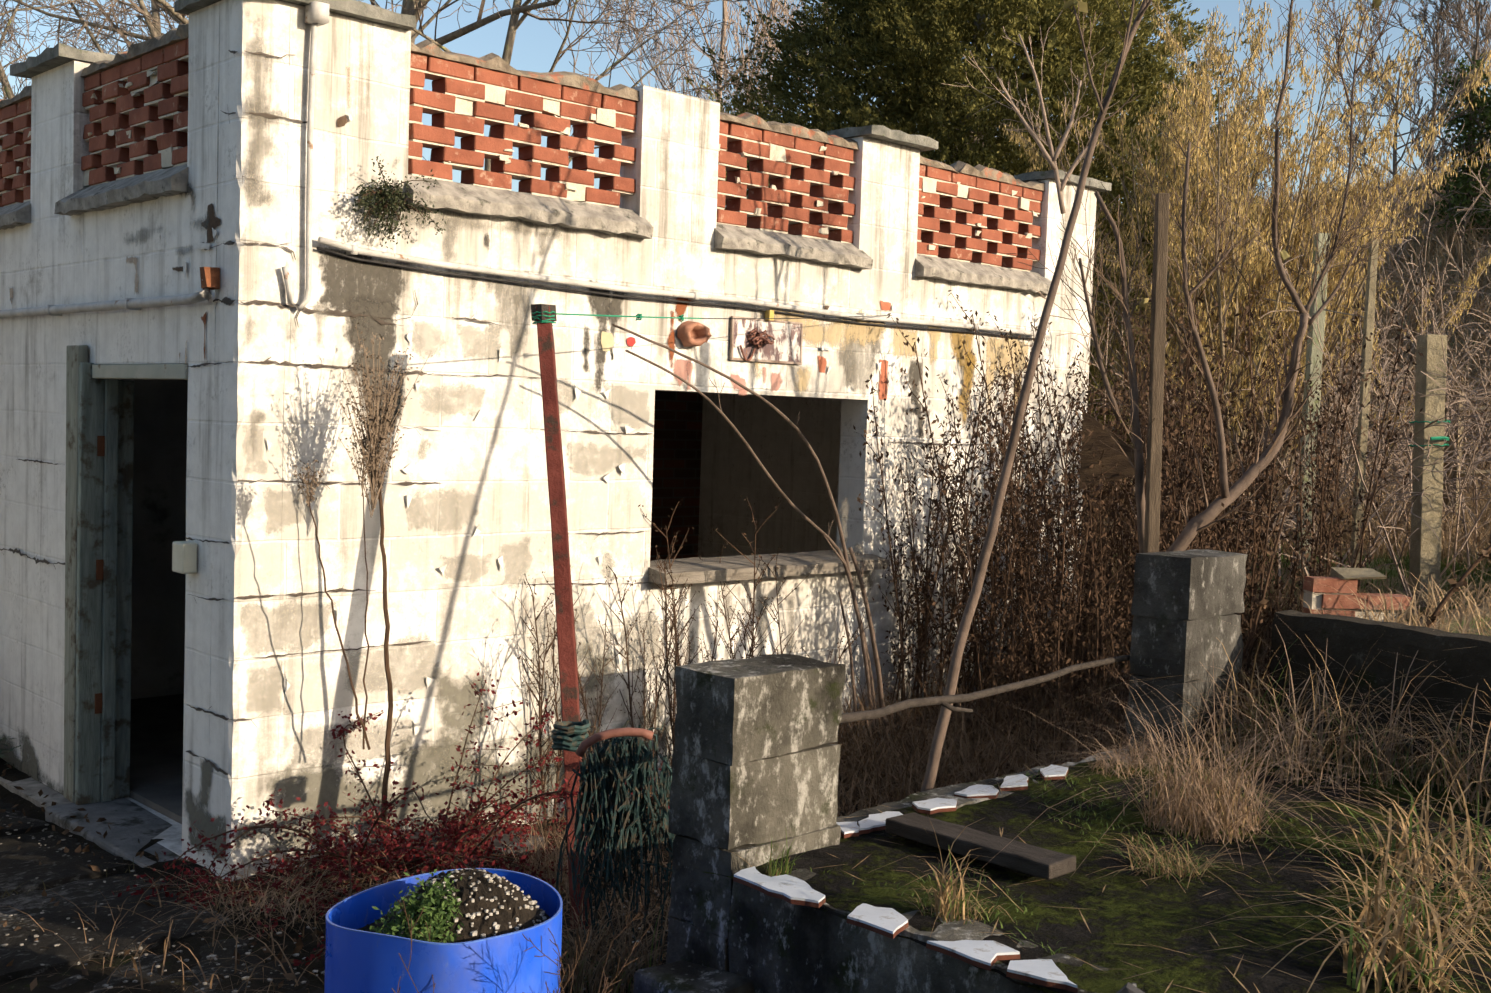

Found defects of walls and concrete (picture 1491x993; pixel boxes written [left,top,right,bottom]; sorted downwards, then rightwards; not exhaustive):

leakage [315,248,405,433]
crack [0,548,65,567]
leakage [0,733,64,795]
leakage [185,676,567,866]
leakage [581,646,670,799]